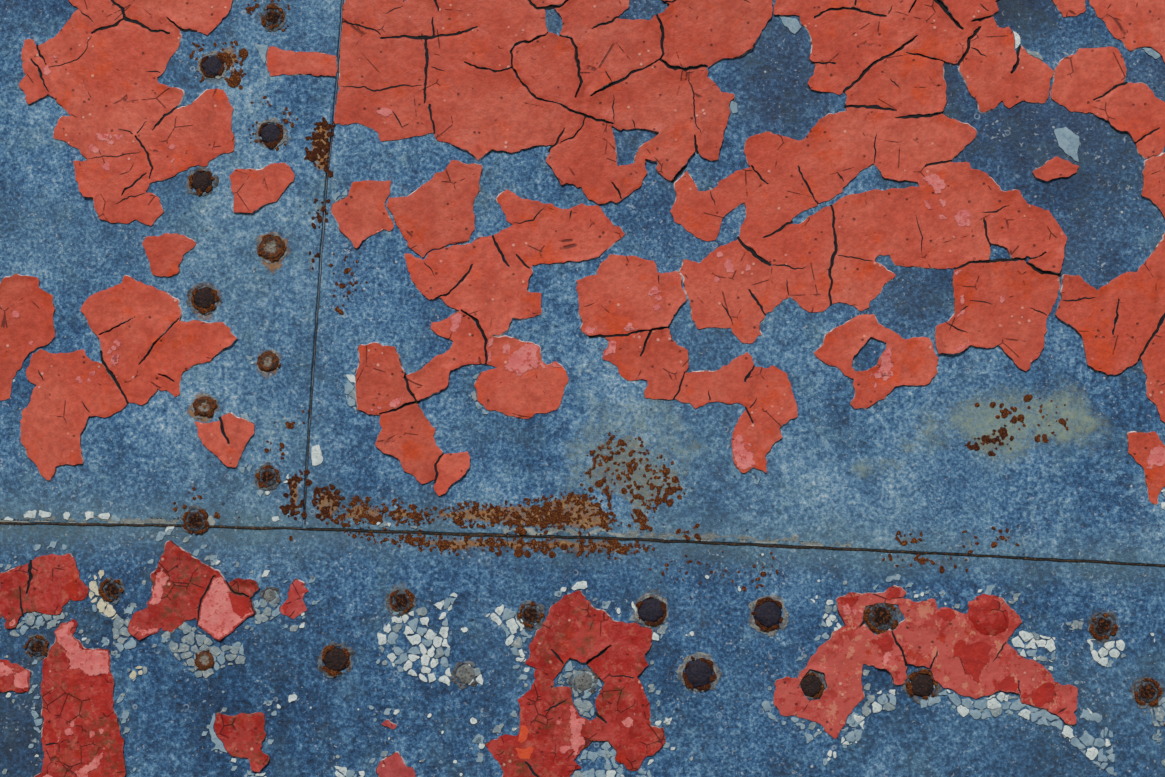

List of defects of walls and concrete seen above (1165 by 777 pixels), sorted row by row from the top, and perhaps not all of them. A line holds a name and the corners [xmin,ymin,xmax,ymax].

corrosion [189,40,248,89]
peeling [0,0,238,481]
peeling [230,163,295,214]
corrosion [304,117,336,177]
crack [0,0,1165,567]
peeling [255,0,1165,509]
corrosion [965,394,1069,456]
corrosion [255,430,701,560]
crack [19,560,33,617]
crack [197,576,249,624]
peeling [469,581,675,777]
peeling [762,574,1115,774]